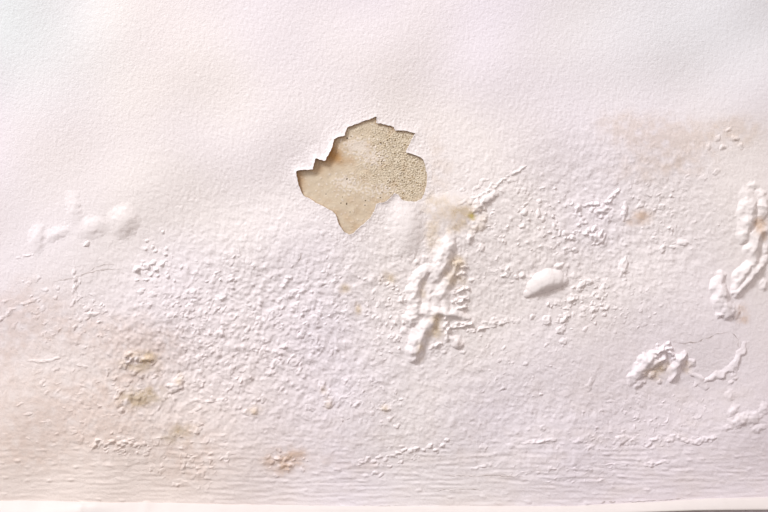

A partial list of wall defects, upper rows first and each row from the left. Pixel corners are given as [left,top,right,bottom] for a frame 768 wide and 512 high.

peeling [282,103,441,248]